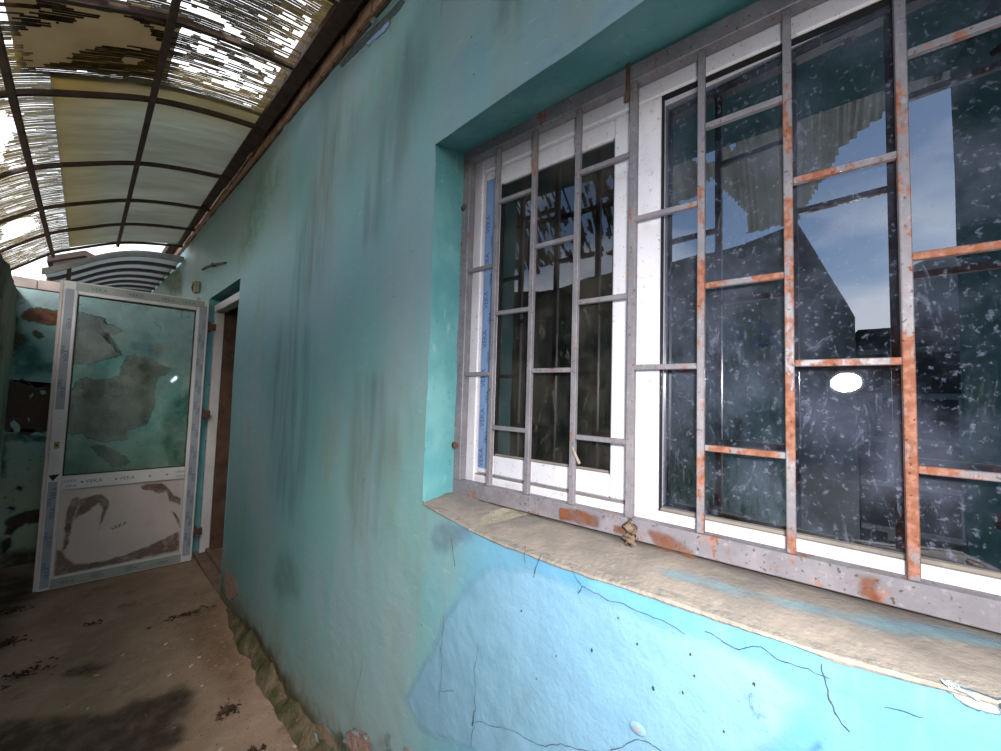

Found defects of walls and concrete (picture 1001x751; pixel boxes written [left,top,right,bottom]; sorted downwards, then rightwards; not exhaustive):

flaking render [4,378,51,435]
flaking render [0,505,40,554]
corrosion [559,508,597,526]
corrosion [649,532,691,557]
crack [470,651,661,751]
flaking render [311,722,373,751]